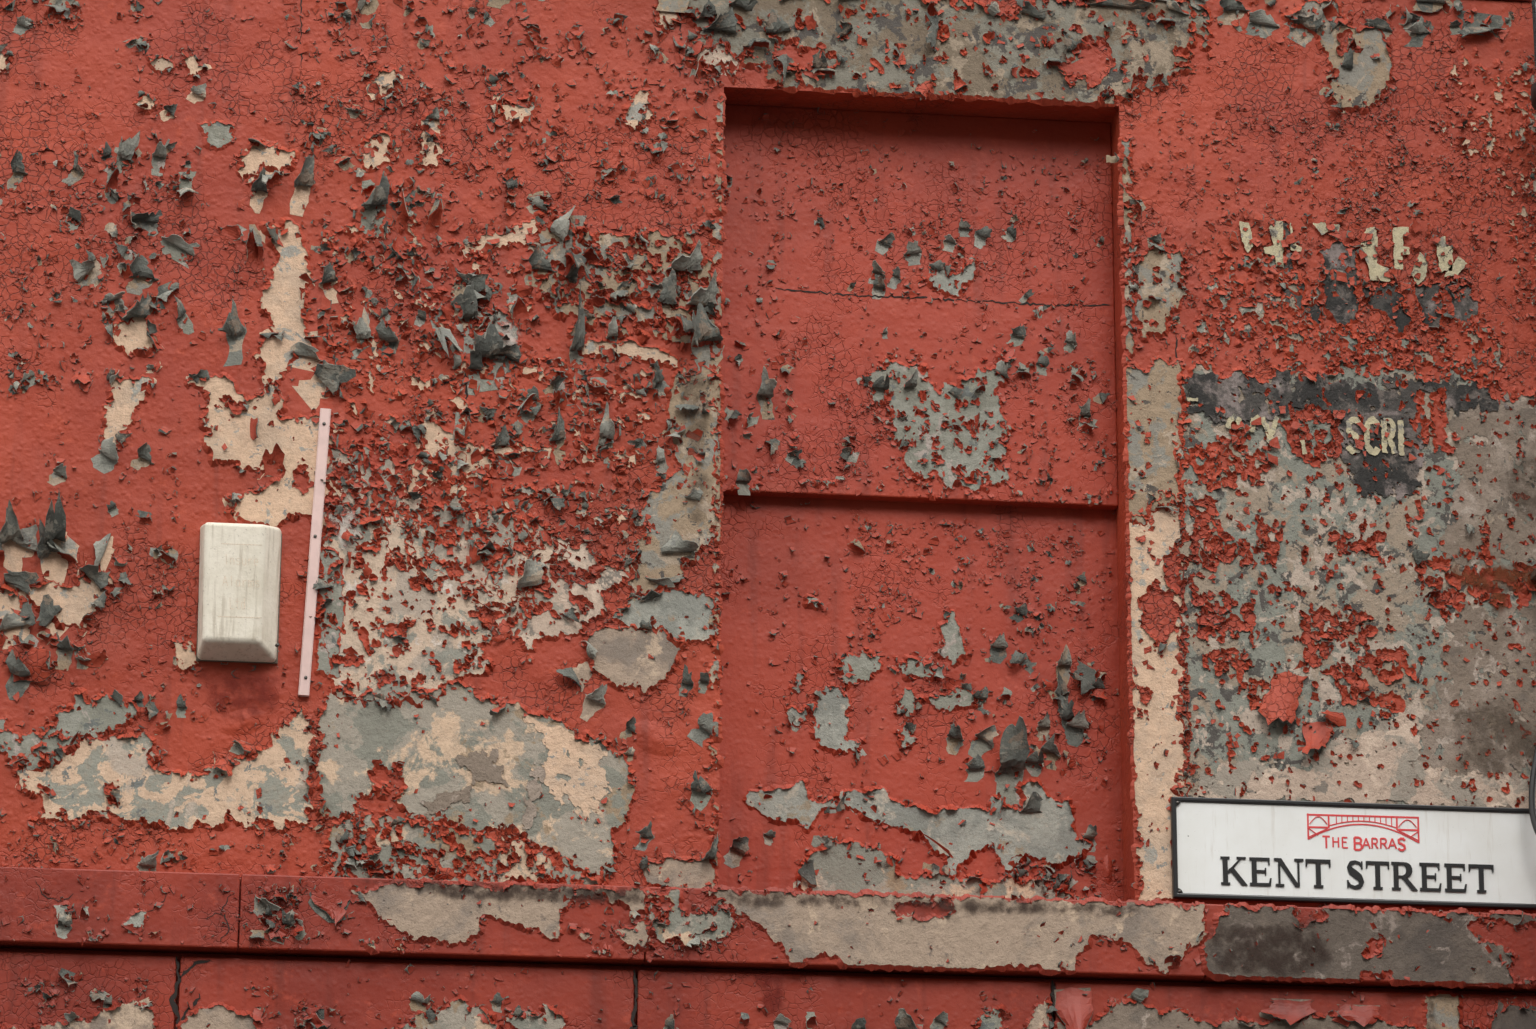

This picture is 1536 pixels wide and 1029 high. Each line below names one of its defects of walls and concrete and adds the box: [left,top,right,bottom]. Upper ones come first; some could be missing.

peeling [110,0,162,23]
peeling [132,87,178,121]
peeling [0,302,93,398]
peeling [296,553,309,581]
peeling [359,936,380,955]
peeling [0,959,369,1029]
peeling [366,965,569,1029]
peeling [648,970,691,1029]
peeling [736,1003,792,1029]